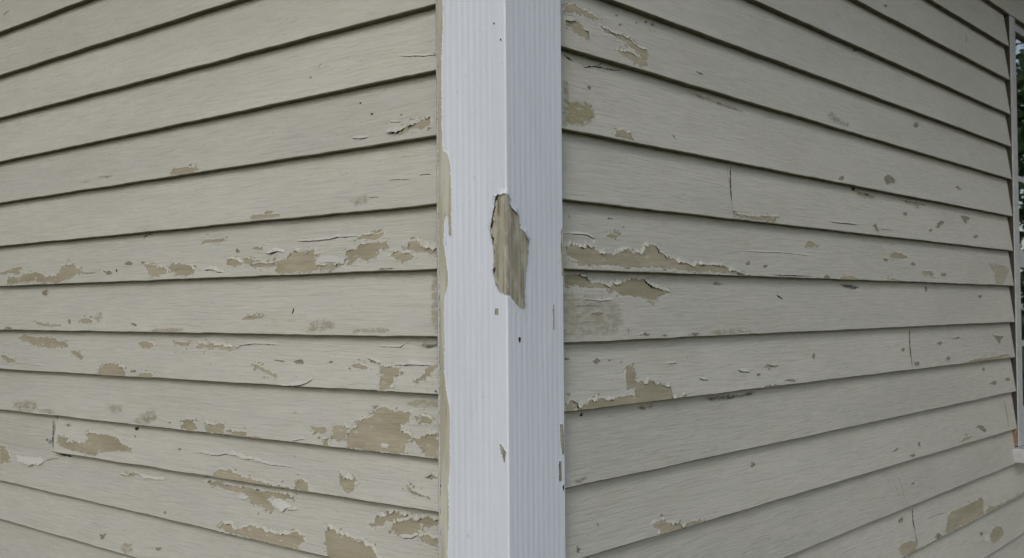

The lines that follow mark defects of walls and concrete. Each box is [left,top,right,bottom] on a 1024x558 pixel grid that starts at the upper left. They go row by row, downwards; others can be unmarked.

peeling [561,2,650,69]
peeling [0,259,82,286]
peeling [102,260,199,279]
peeling [201,0,454,558]
peeling [487,187,531,316]
peeling [560,217,752,305]
peeling [46,423,140,458]
peeling [558,356,687,492]
peeling [934,489,1024,544]